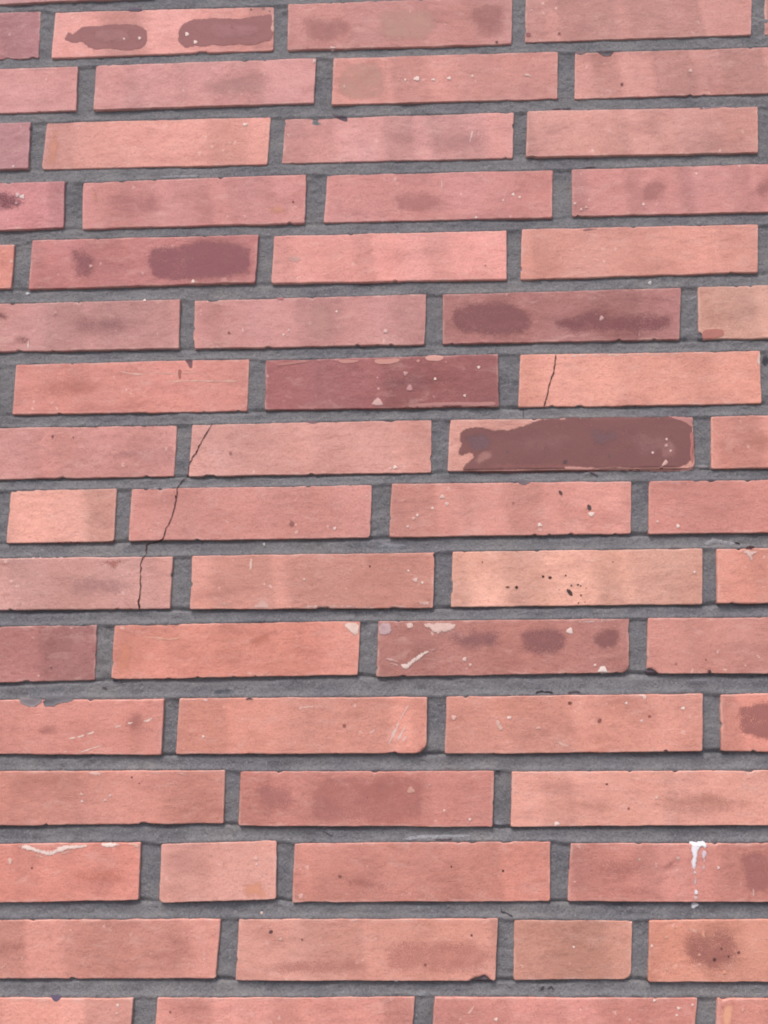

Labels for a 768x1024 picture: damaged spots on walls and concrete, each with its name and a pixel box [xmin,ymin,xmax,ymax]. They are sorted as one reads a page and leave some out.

crack [522,356,556,418]
leakage [458,416,713,474]
crack [137,424,212,609]